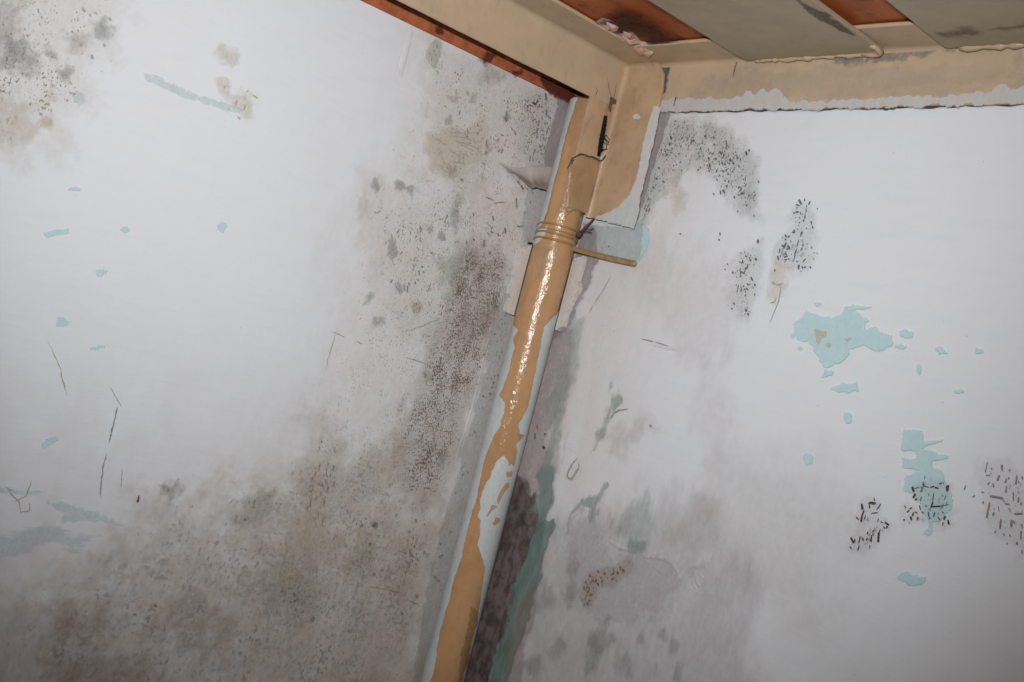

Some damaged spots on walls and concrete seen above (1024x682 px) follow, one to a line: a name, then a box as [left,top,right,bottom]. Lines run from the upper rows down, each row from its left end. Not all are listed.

water stain [638,117,759,220]
peeling [554,111,670,338]
water stain [725,239,759,316]
water stain [773,198,818,283]
water stain [365,180,529,598]
peeling [791,302,913,393]
crack [5,483,31,512]
crack [100,389,140,503]
water stain [464,332,579,682]
water stain [850,498,889,550]
peeling [901,429,952,536]
water stain [964,462,1023,554]